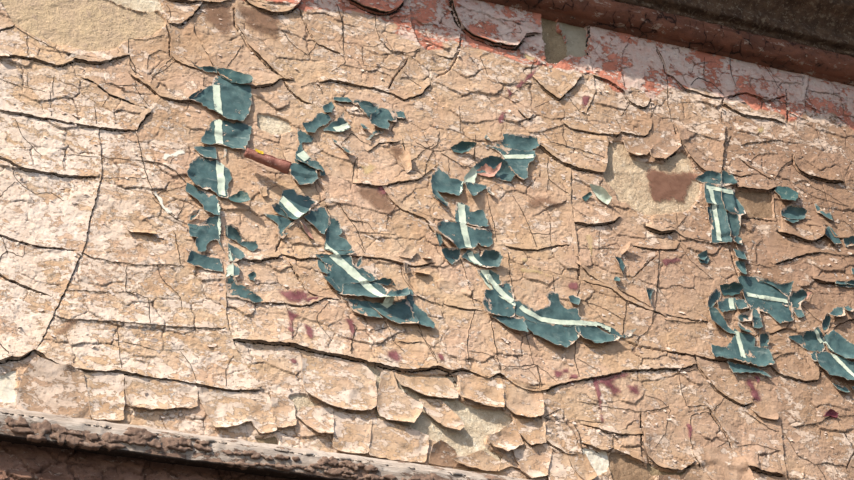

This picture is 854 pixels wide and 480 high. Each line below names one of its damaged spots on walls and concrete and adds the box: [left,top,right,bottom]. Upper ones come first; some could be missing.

flaking render [0,0,165,52]
crack [301,0,546,101]
crack [243,235,340,341]
peeling [185,60,435,329]
crack [352,132,476,248]
peeling [430,133,637,348]
crack [505,26,723,351]
flaking render [603,142,854,378]
crack [656,45,854,268]
peeling [788,306,854,393]
flaking render [374,373,512,462]
crack [543,395,700,470]